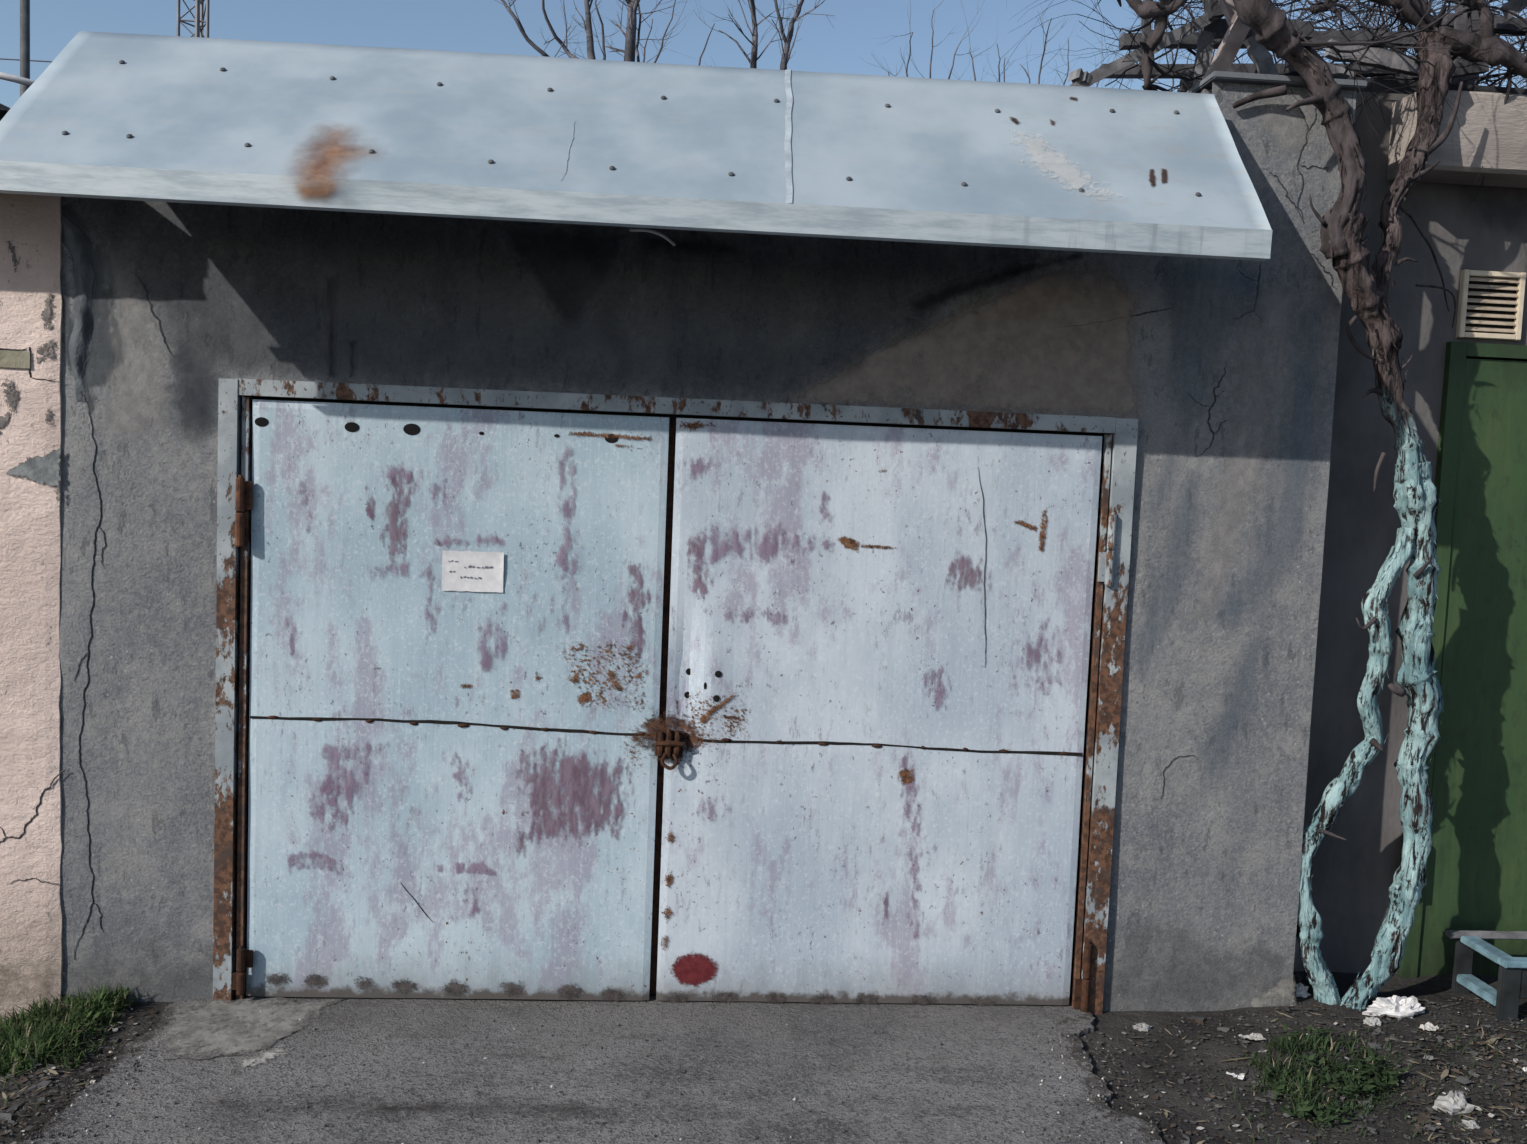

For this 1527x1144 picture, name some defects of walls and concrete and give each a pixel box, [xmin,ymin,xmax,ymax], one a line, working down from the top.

rust [299,133,355,197]
peeling [36,293,55,363]
damp [62,199,1034,422]
peeling [0,380,20,435]
rust [680,421,715,431]
peeling [7,449,61,507]
crack [0,347,106,960]
rust [557,639,750,777]
peeling [516,739,630,855]